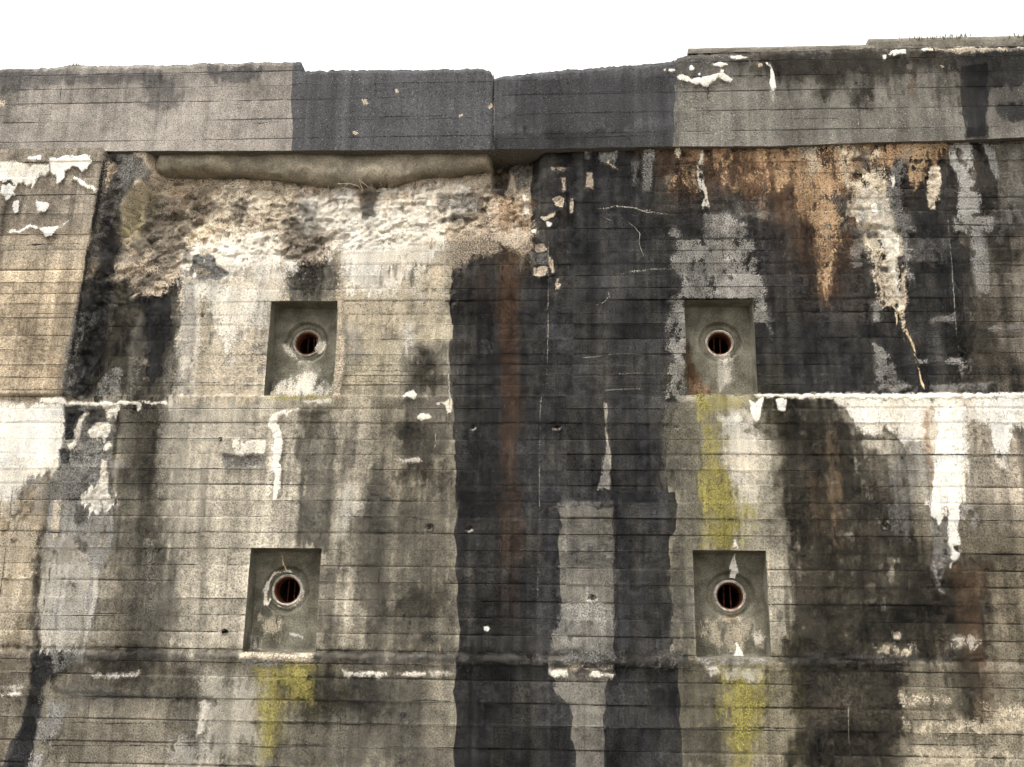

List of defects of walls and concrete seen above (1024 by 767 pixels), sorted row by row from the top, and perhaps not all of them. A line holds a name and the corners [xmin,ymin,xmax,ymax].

spalling [585,149,618,168]
spalling [632,149,655,191]
corrosion [671,145,847,297]
corrosion [864,142,948,209]
spalling [45,152,574,540]
damp [285,46,1024,767]
damp [0,246,445,767]